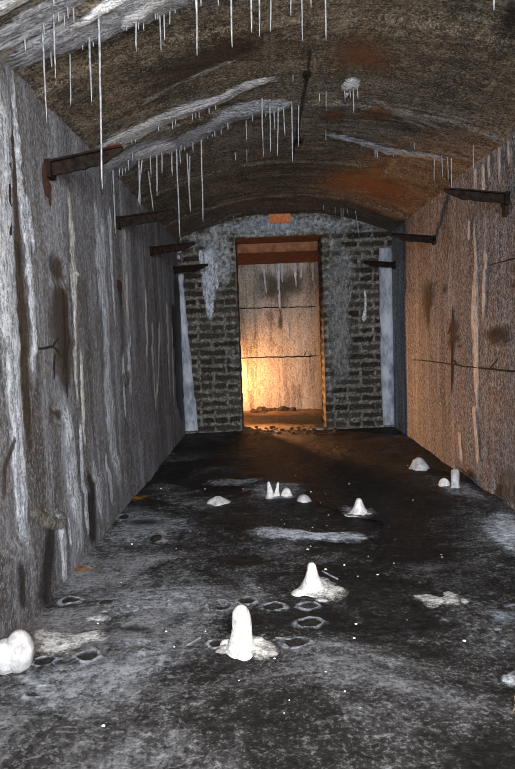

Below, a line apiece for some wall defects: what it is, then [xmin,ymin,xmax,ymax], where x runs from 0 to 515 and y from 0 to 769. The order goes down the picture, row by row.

water stain [0,0,29,17]
water stain [69,0,126,32]
water stain [120,0,169,31]
water stain [151,39,252,88]
water stain [172,95,231,119]
water stain [134,142,178,161]
water stain [473,140,510,190]
water stain [199,248,219,318]
crack [415,308,515,392]